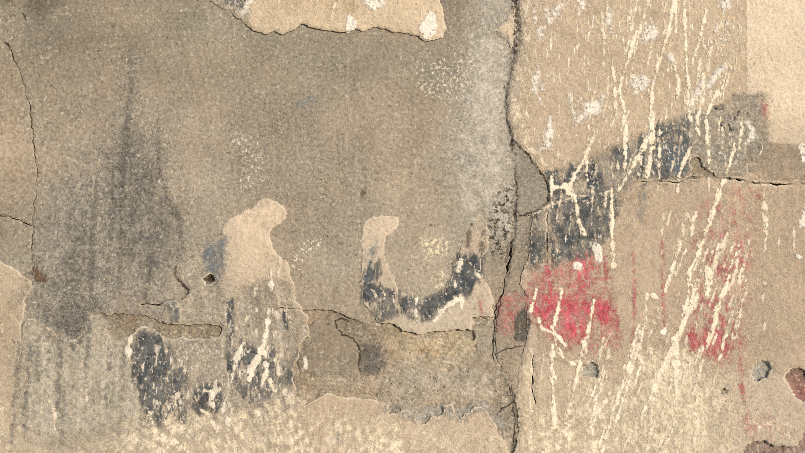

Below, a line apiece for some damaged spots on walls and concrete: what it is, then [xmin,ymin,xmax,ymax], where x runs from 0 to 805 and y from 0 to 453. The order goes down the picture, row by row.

crack [724,177,804,186]
peeling [0,0,551,453]
crack [472,0,551,446]
crack [141,266,190,306]
crack [335,318,361,371]
spalling [785,367,805,402]
spalling [740,431,805,453]